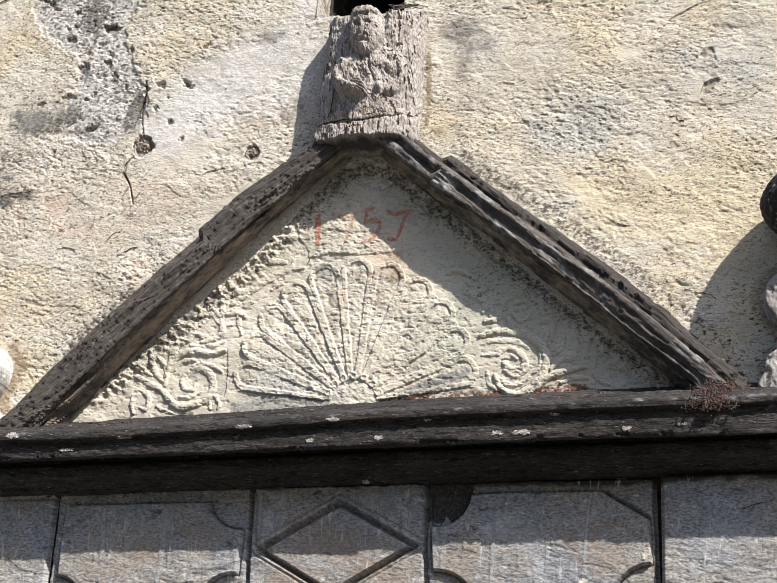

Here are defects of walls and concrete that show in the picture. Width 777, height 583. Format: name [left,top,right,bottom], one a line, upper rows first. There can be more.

crack [134,81,149,134]
peeling [32,0,329,157]
spalling [245,146,260,160]
water stain [427,483,473,558]